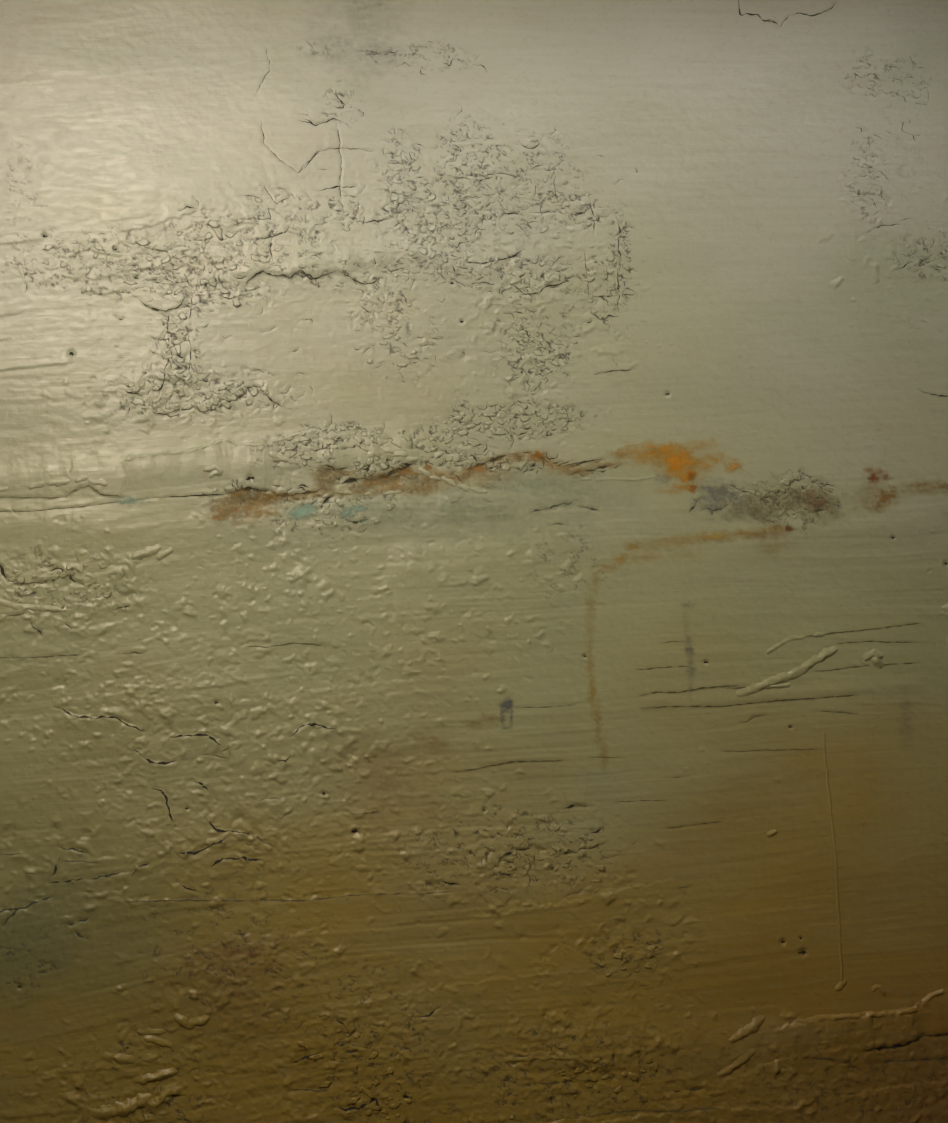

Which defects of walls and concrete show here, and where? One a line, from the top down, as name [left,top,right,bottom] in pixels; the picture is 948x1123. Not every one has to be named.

crack [738,0,835,25]
peeling [21,217,316,418]
crack [125,89,386,415]
peeling [327,107,639,382]
peeling [202,399,619,532]
rust [630,444,718,492]